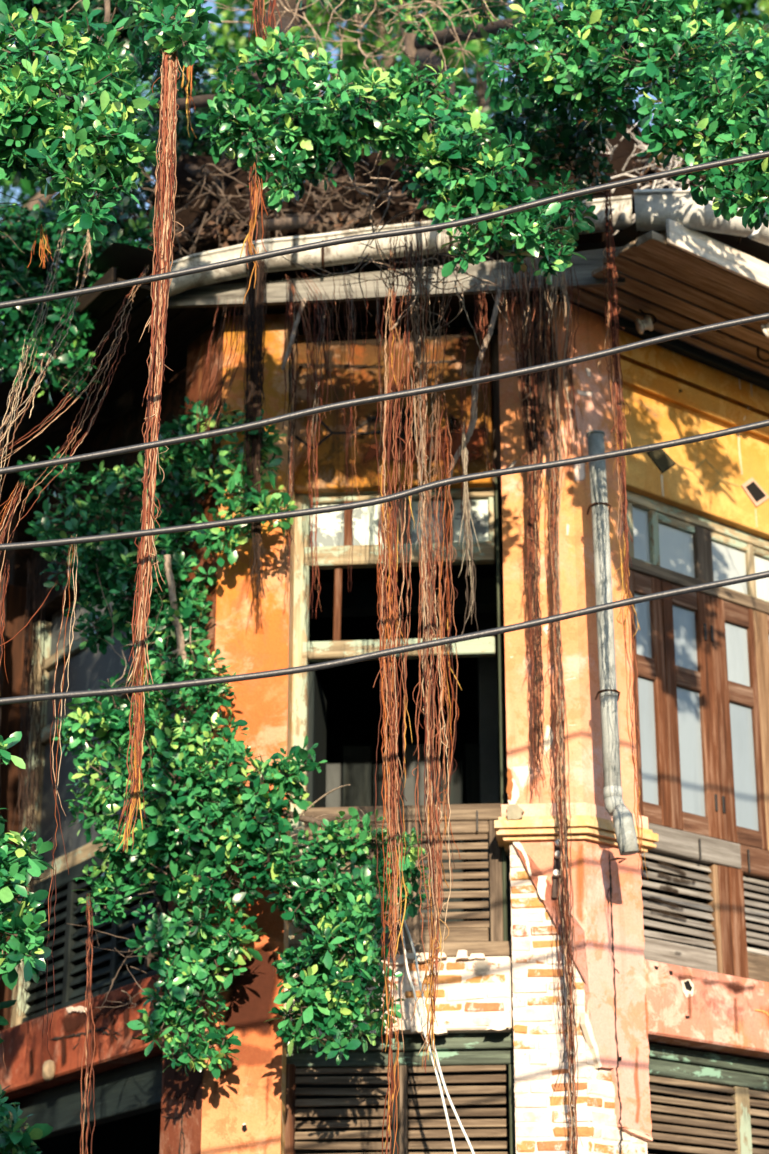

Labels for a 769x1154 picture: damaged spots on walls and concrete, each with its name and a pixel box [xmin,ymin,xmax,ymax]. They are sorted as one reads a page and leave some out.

peeling [360,407,486,464]
spalling [352,841,653,1154]